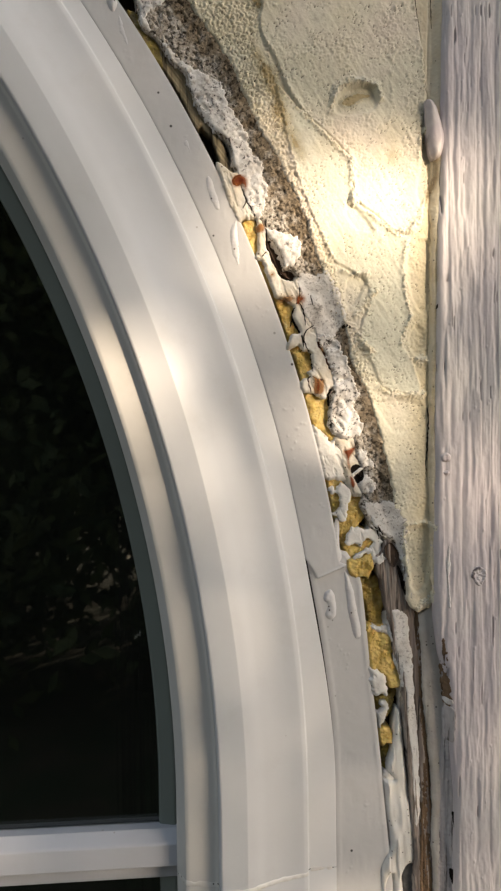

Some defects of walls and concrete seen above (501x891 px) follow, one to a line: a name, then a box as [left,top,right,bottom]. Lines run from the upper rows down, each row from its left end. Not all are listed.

spalling [133,0,412,594]
peeling [381,609,421,826]